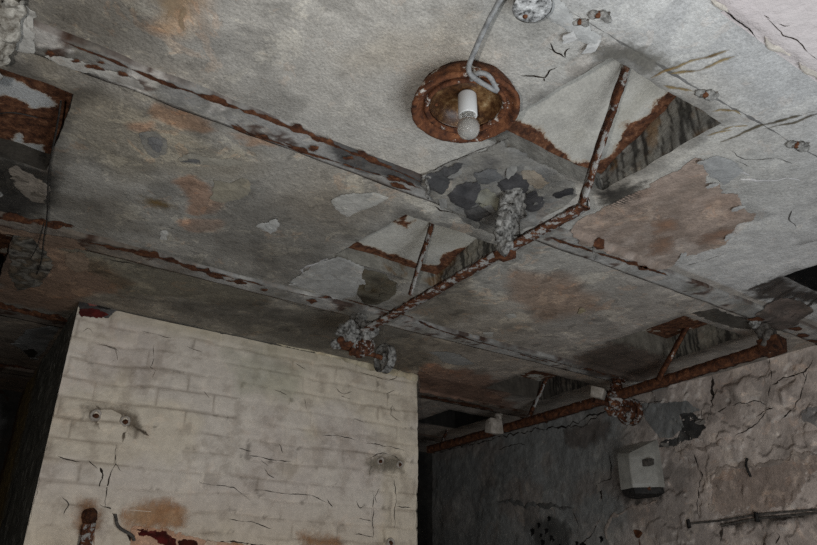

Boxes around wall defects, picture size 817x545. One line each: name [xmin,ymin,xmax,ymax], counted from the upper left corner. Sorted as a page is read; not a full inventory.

corrosion [65,42,421,191]
spalling [421,141,577,234]
corrosion [0,212,76,229]
corrosion [550,237,666,275]
peeling [641,401,706,448]
crack [701,360,813,436]
crack [58,449,120,516]
crack [239,444,332,506]
spalling [130,525,250,545]
crack [221,519,271,545]
crack [356,483,410,537]
damp [530,516,586,545]